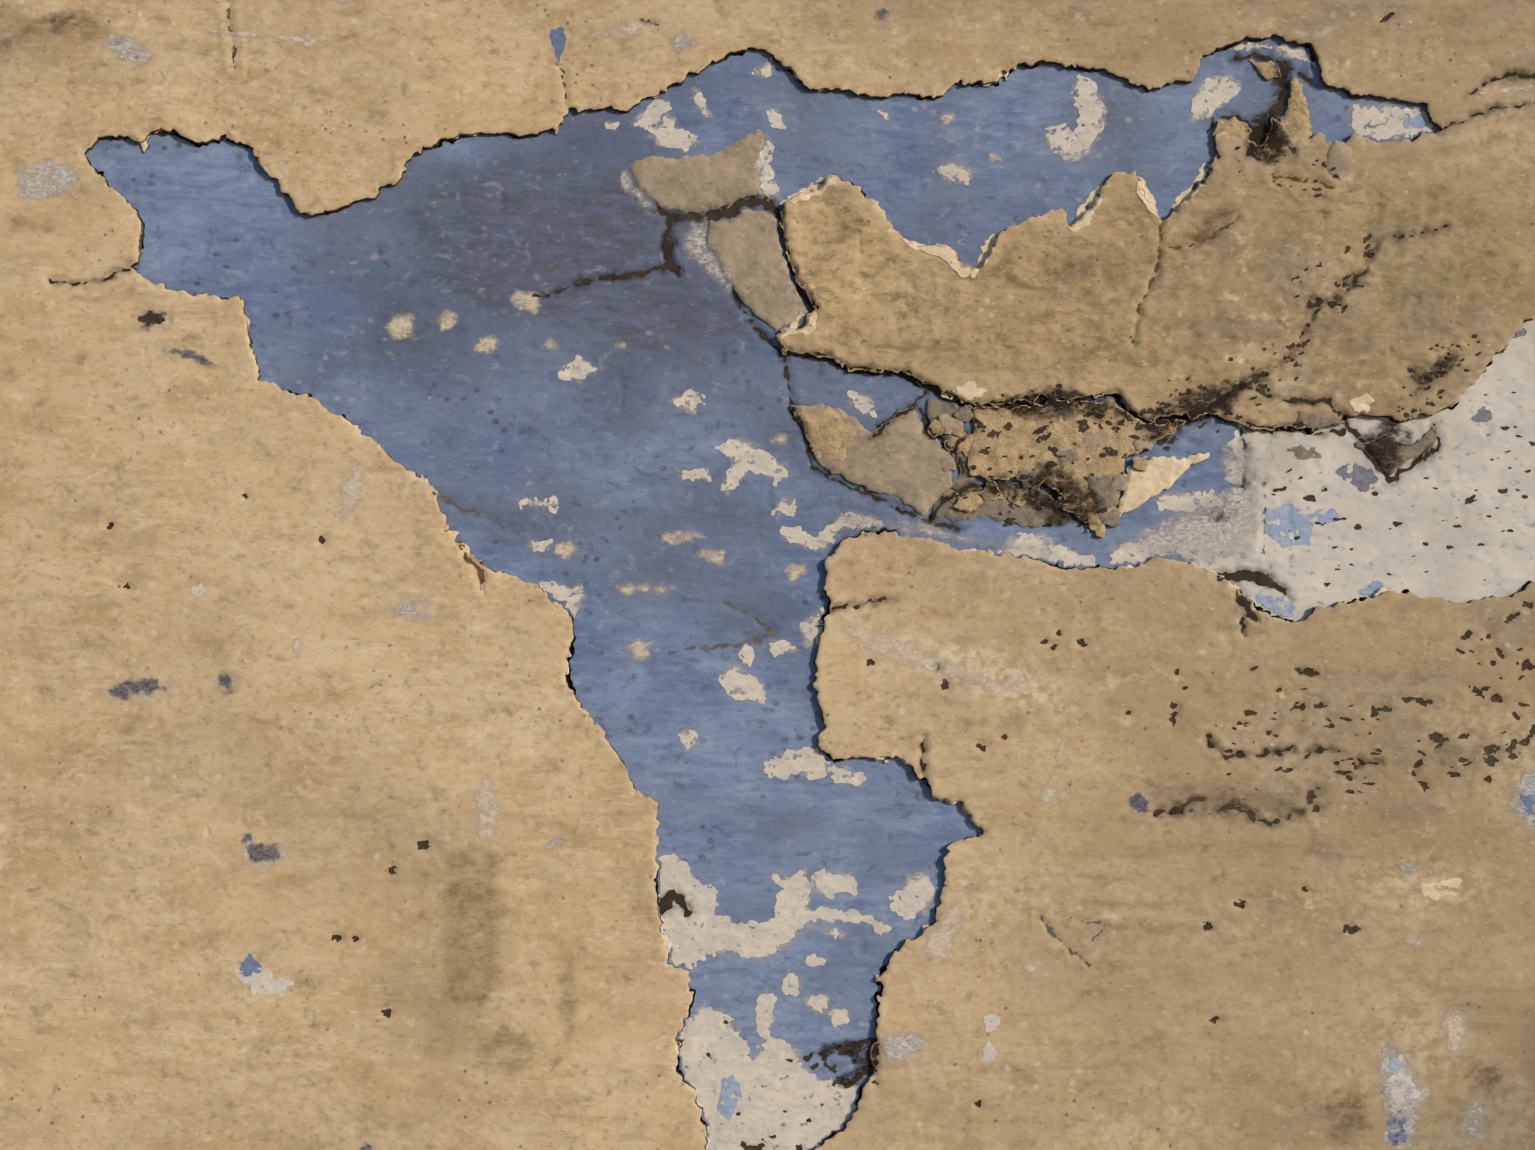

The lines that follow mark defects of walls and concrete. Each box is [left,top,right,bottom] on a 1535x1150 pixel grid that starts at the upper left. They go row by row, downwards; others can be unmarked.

crack [532,196,819,311]
spalling [138,310,169,327]
peeling [952,381,987,401]
crack [733,221,1449,633]
spalling [1040,629,1088,650]
peeling [102,678,169,700]
spalling [1169,668,1188,726]
spalling [1206,667,1433,794]
spalling [1446,630,1535,830]
spalling [1411,732,1470,792]
peeling [234,953,295,997]
peeling [1380,1043,1429,1149]